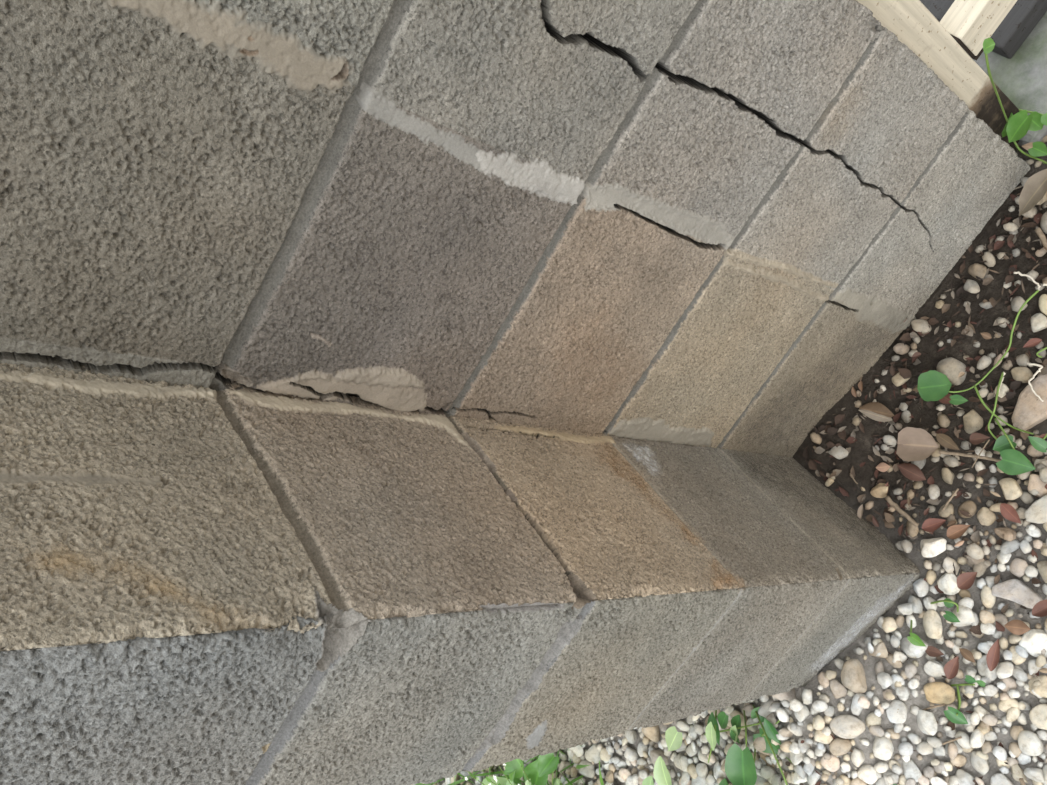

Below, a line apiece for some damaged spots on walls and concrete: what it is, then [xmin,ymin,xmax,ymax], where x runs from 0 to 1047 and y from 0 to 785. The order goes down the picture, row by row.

spalling [331,60,350,80]
crack [540,0,935,253]